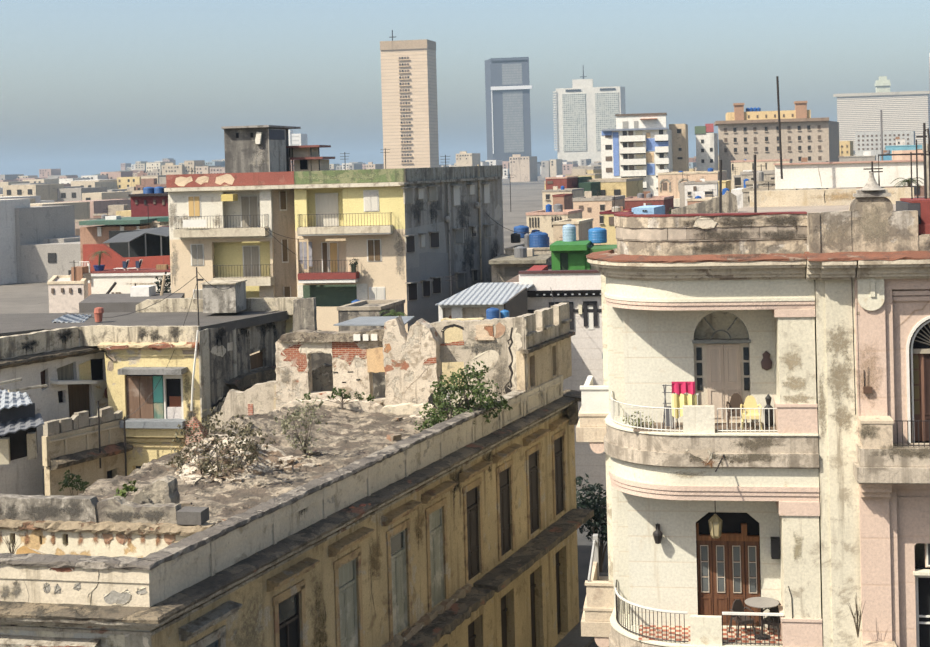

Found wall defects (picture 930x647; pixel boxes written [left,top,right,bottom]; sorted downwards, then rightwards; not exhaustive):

peeling [175,174,235,186]
spalling [440,324,464,346]
spalling [495,322,522,351]
flaking render [280,342,367,383]
spalling [468,350,499,381]
leakage [782,329,879,439]
leakage [876,445,930,459]
leakage [1,581,21,599]